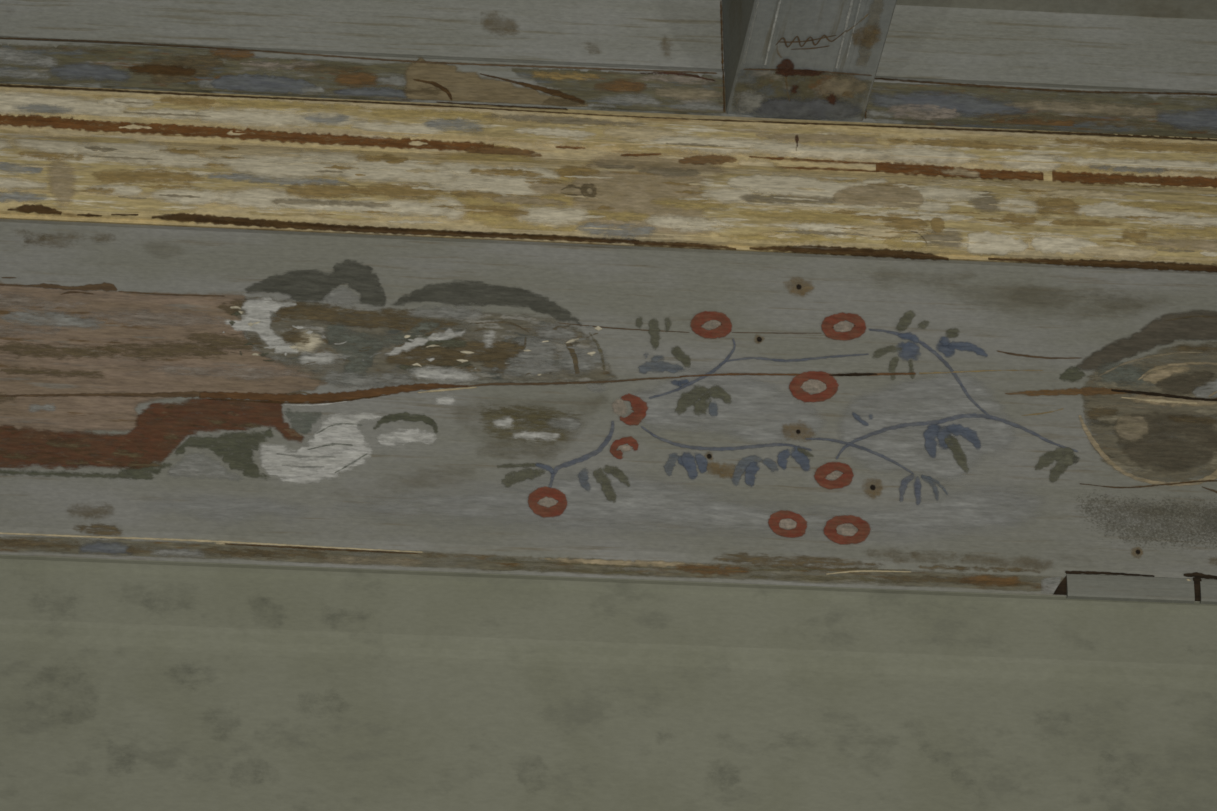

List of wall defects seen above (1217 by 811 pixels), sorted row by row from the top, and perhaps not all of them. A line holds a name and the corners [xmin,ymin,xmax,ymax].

peeling [0,0,1217,264]
crack [0,373,800,406]
crack [829,351,1217,416]